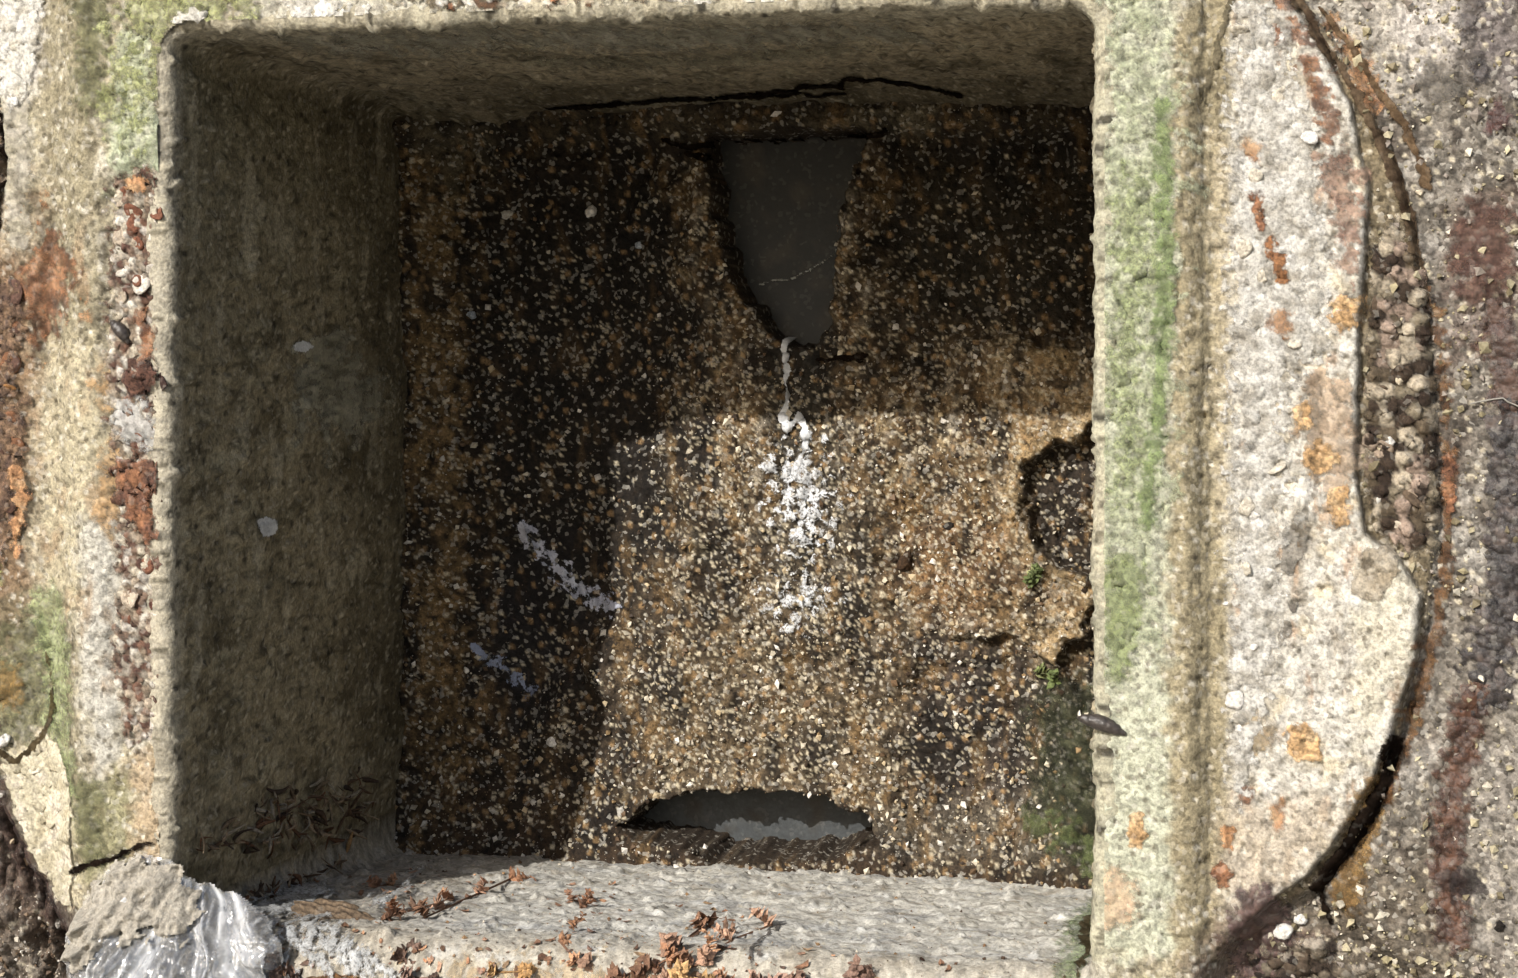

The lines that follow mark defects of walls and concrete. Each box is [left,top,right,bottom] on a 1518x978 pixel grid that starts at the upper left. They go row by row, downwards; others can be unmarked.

crack [545,76,964,162]
crack [1199,0,1234,106]
rust [1248,191,1290,284]
rust [1272,0,1387,332]
crack [1290,0,1433,336]
rust [0,192,90,570]
peeling [392,100,1096,890]
rust [1289,367,1367,537]
water stain [1422,194,1518,956]
rust [0,810,81,978]
crack [69,839,159,875]
crack [1308,734,1406,925]